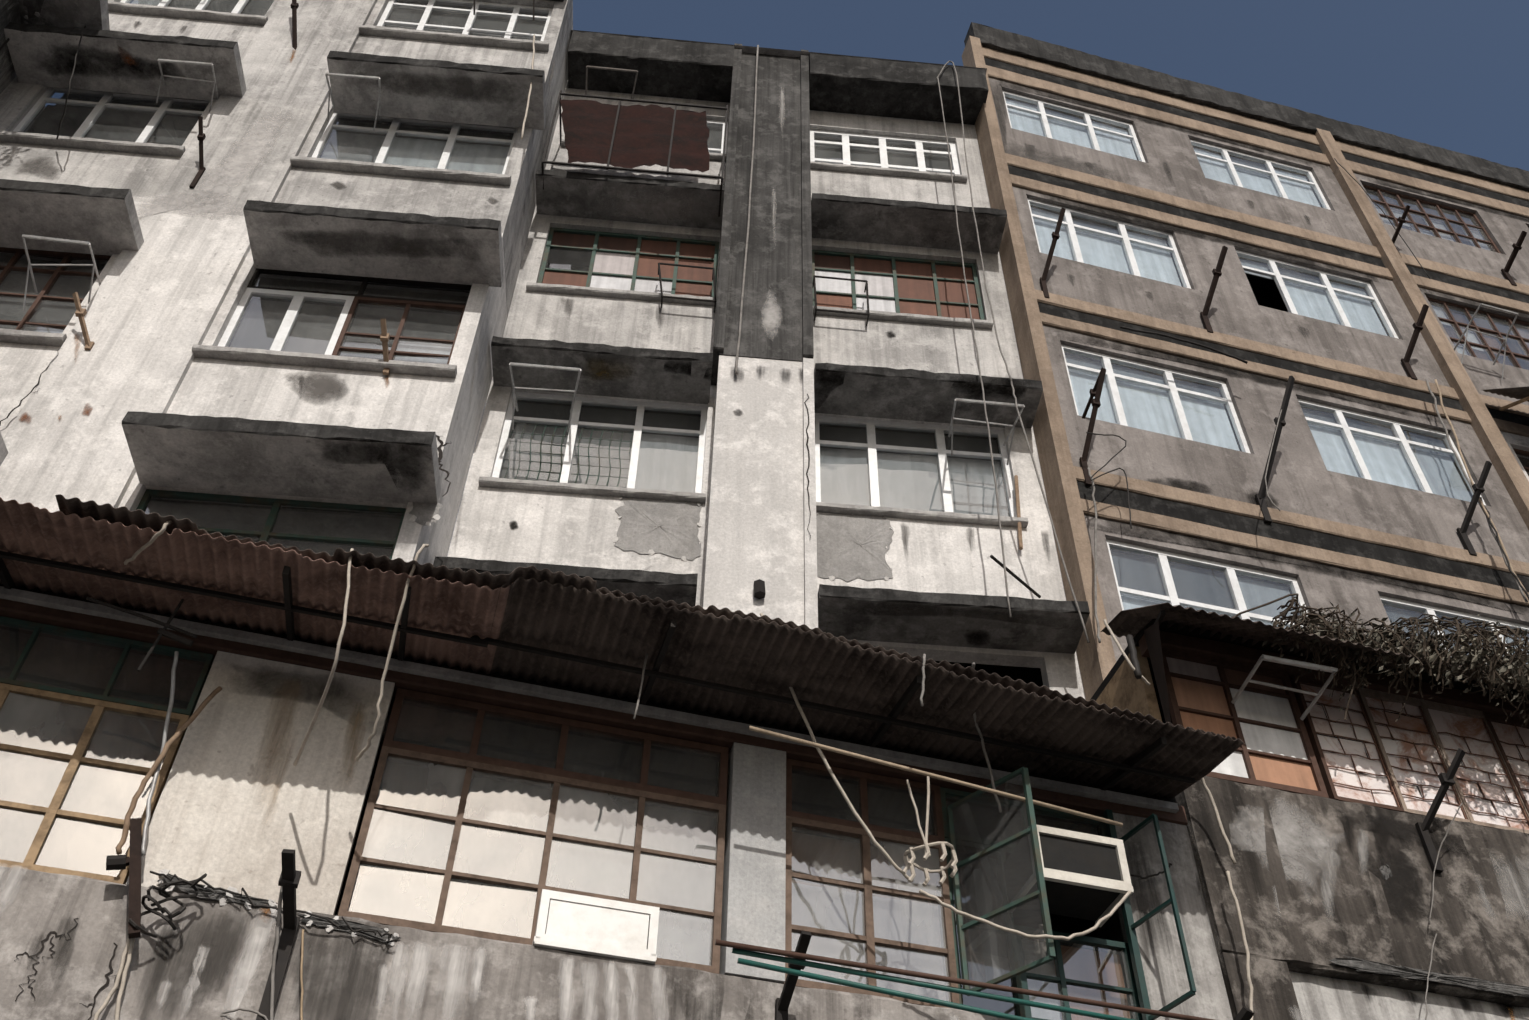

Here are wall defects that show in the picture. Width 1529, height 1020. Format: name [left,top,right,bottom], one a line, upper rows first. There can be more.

crack [14,918,78,1001]
leakage [57,921,75,961]
crack [79,943,118,1020]
leakage [150,910,275,1018]
leakage [298,940,484,1020]
leakage [528,998,536,1020]
leakage [561,958,634,1020]
leakage [1128,854,1165,954]
leakage [1342,815,1467,921]
leakage [1498,1003,1514,1020]